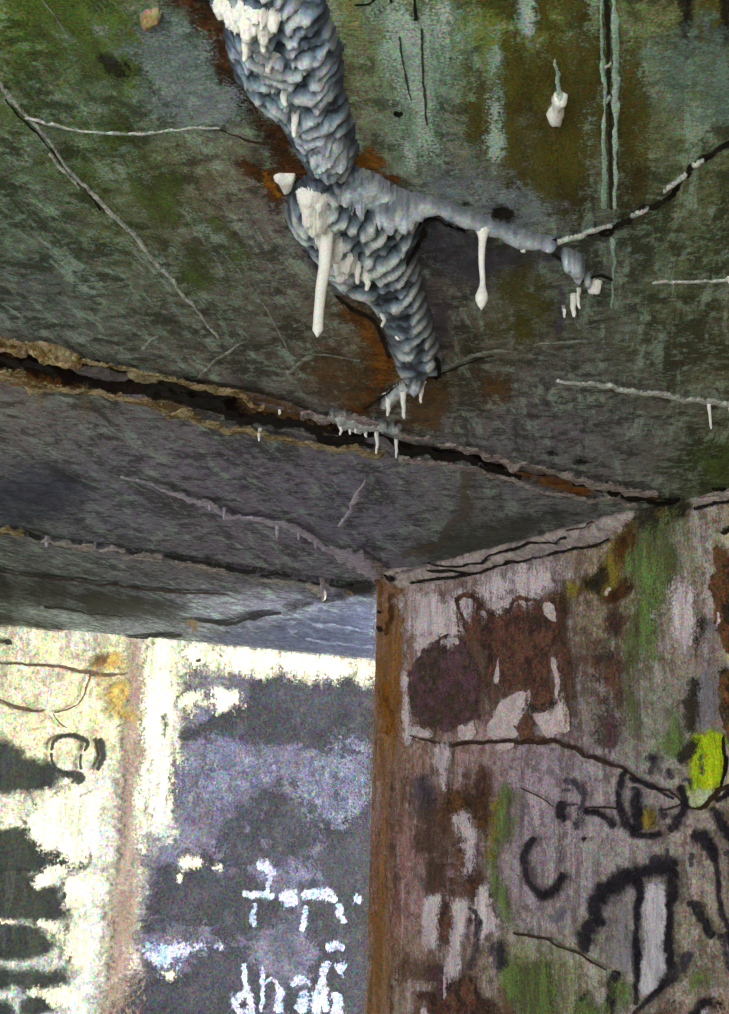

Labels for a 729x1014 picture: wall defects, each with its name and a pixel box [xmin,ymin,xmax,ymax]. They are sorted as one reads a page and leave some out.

crack [5,99,289,211]
rust [162,0,308,215]
rust [354,147,400,183]
leakage [359,0,552,231]
leakage [419,216,559,353]
crack [552,140,729,335]
crack [410,521,609,584]
leakage [0,740,64,795]
leakage [296,735,373,830]
rust [363,578,409,1014]
crack [409,735,729,812]
leakage [0,826,93,1014]